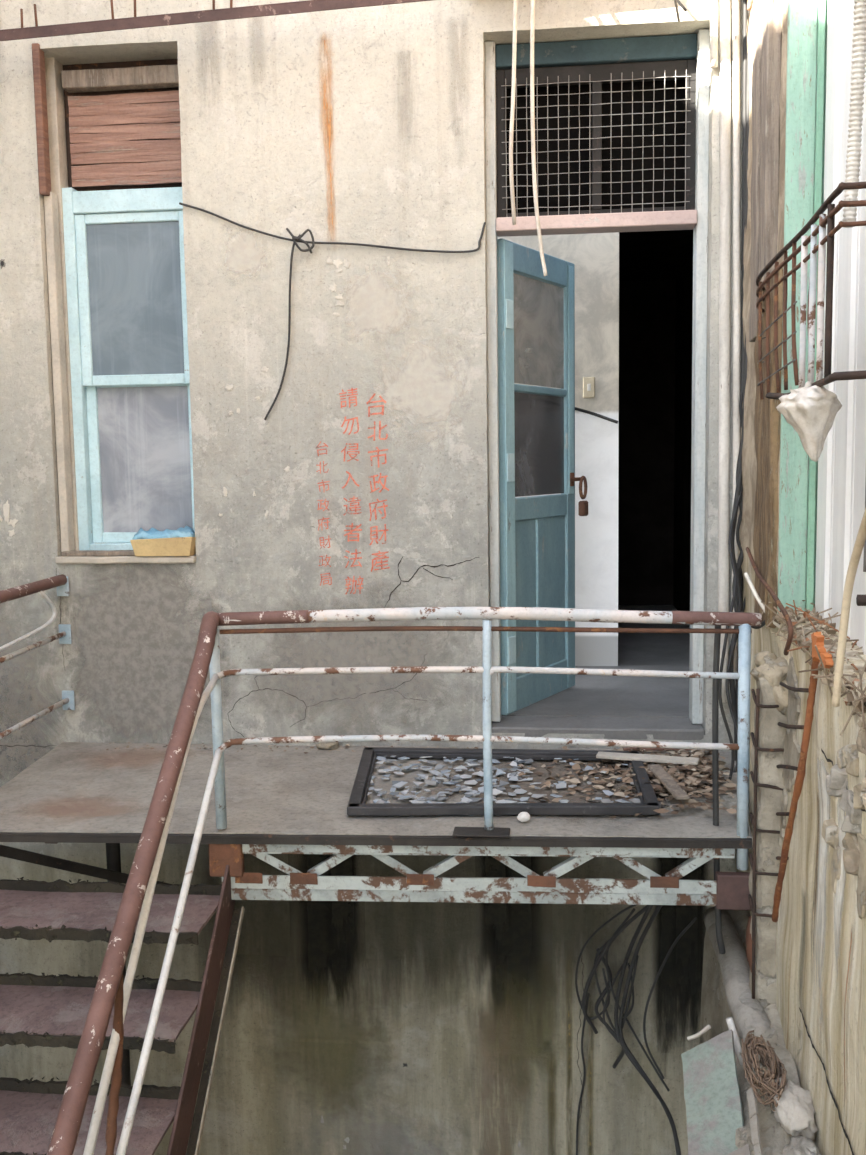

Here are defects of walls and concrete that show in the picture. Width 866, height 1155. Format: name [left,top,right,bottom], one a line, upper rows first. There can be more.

corrosion [323,72,331,158]
crack [384,557,479,608]
damp [205,844,222,885]
damp [244,854,612,879]
damp [656,857,707,880]
damp [799,762,846,1013]
damp [655,905,706,1058]
damp [226,900,612,1155]